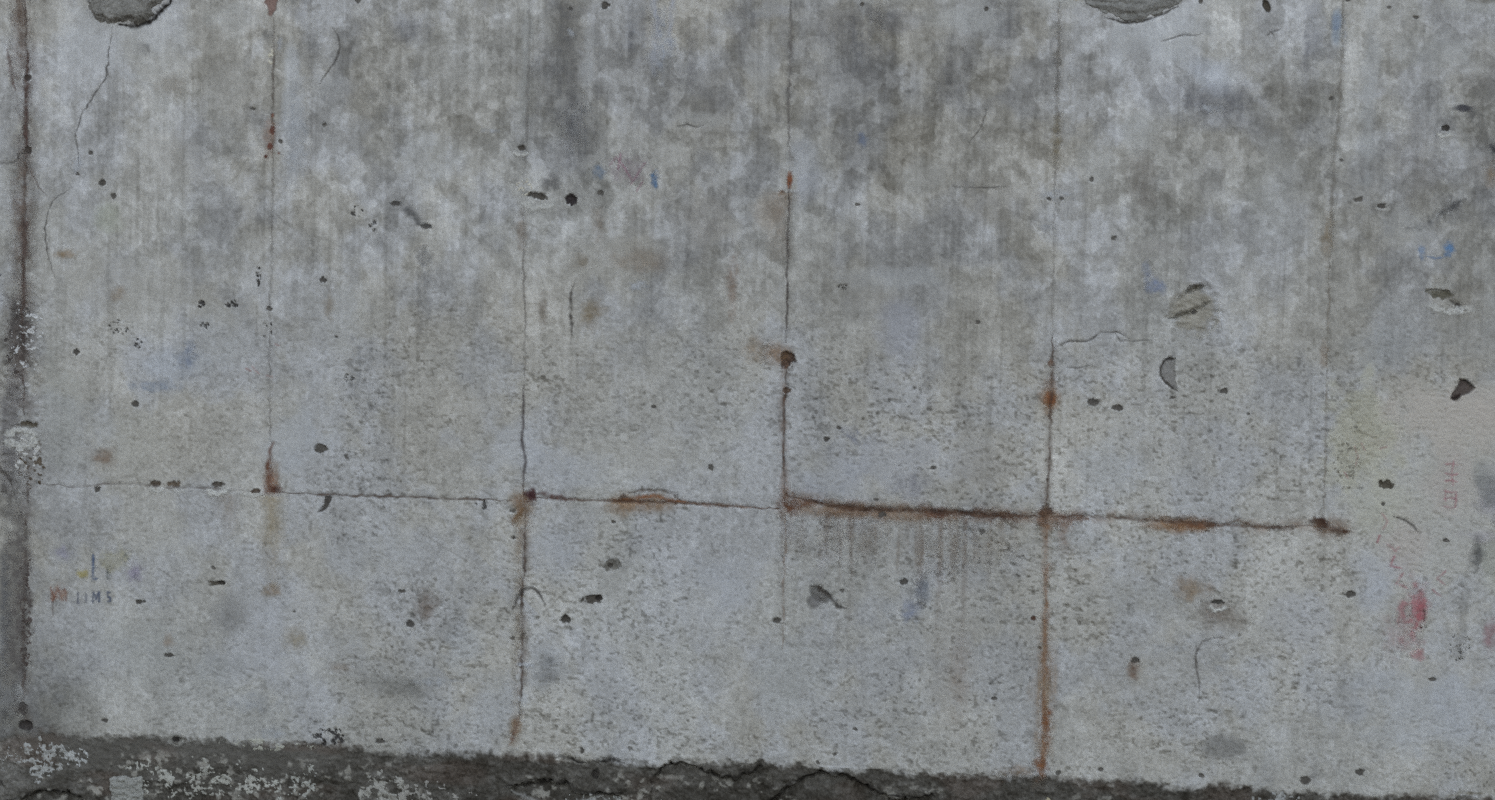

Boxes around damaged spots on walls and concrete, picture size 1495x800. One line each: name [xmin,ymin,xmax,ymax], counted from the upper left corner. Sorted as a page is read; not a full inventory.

crack [21,0,47,413]
spalling [1171,286,1216,336]
rust [1044,390,1056,406]
rust [515,488,566,518]
rust [615,489,686,510]
rust [1039,508,1087,529]
rust [1160,520,1215,531]
rust [1312,517,1350,533]
crack [1,470,56,721]